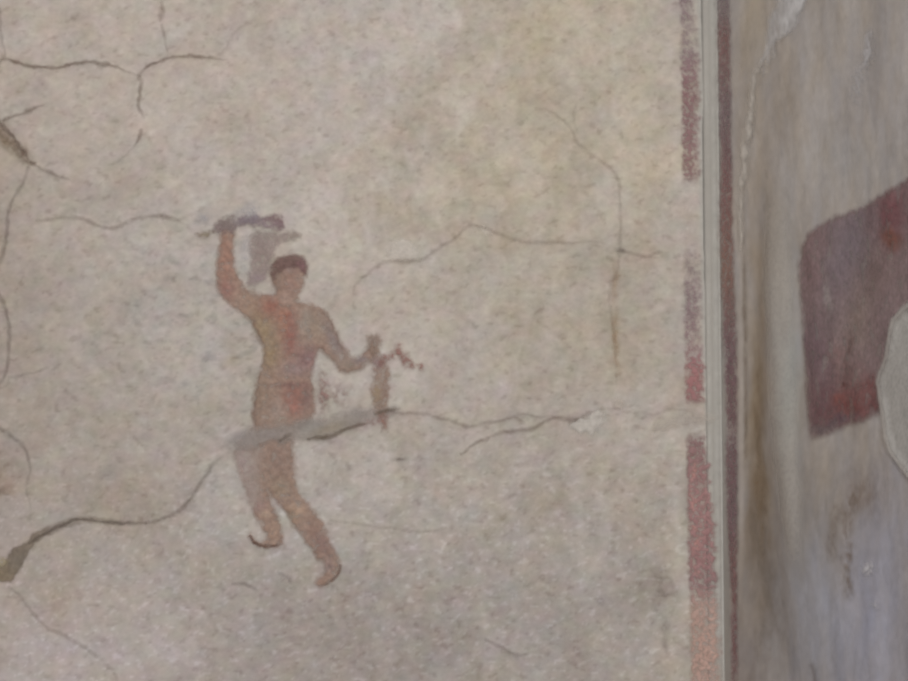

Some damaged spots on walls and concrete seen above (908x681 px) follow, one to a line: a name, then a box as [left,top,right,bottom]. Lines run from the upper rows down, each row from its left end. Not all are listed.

flaking render [876,304,908,477]